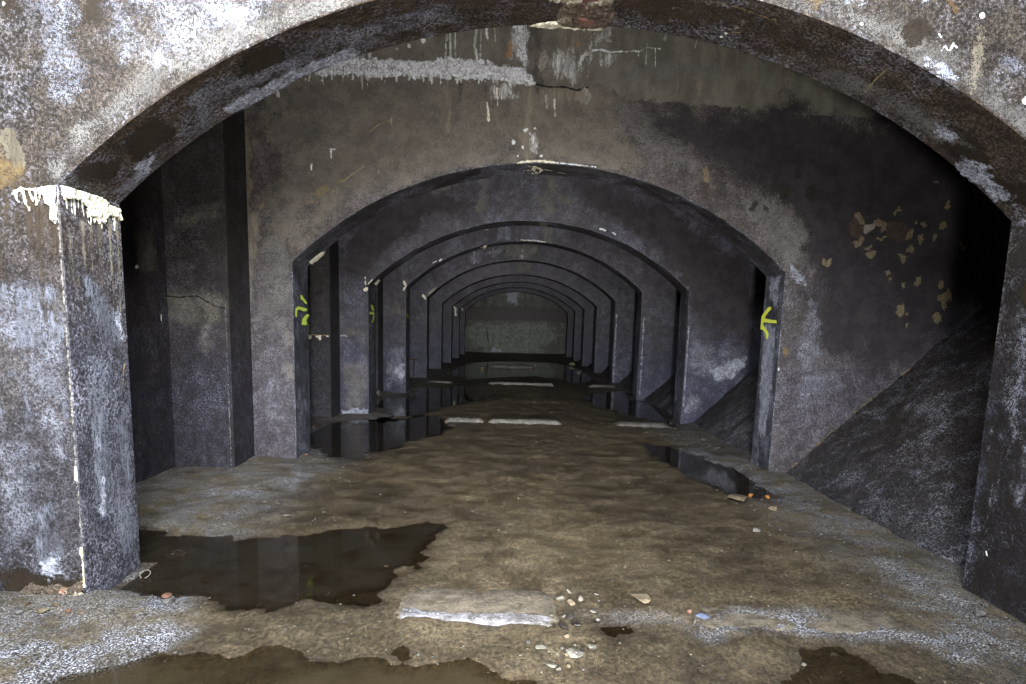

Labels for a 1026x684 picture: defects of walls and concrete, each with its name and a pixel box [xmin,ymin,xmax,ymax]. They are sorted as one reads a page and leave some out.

spalling [531,0,616,86]
water stain [0,0,1026,437]
peeling [849,200,951,264]
peeling [896,303,908,329]
peeling [932,280,952,324]
water stain [0,272,85,594]
water stain [86,358,138,564]
water stain [963,223,1026,624]